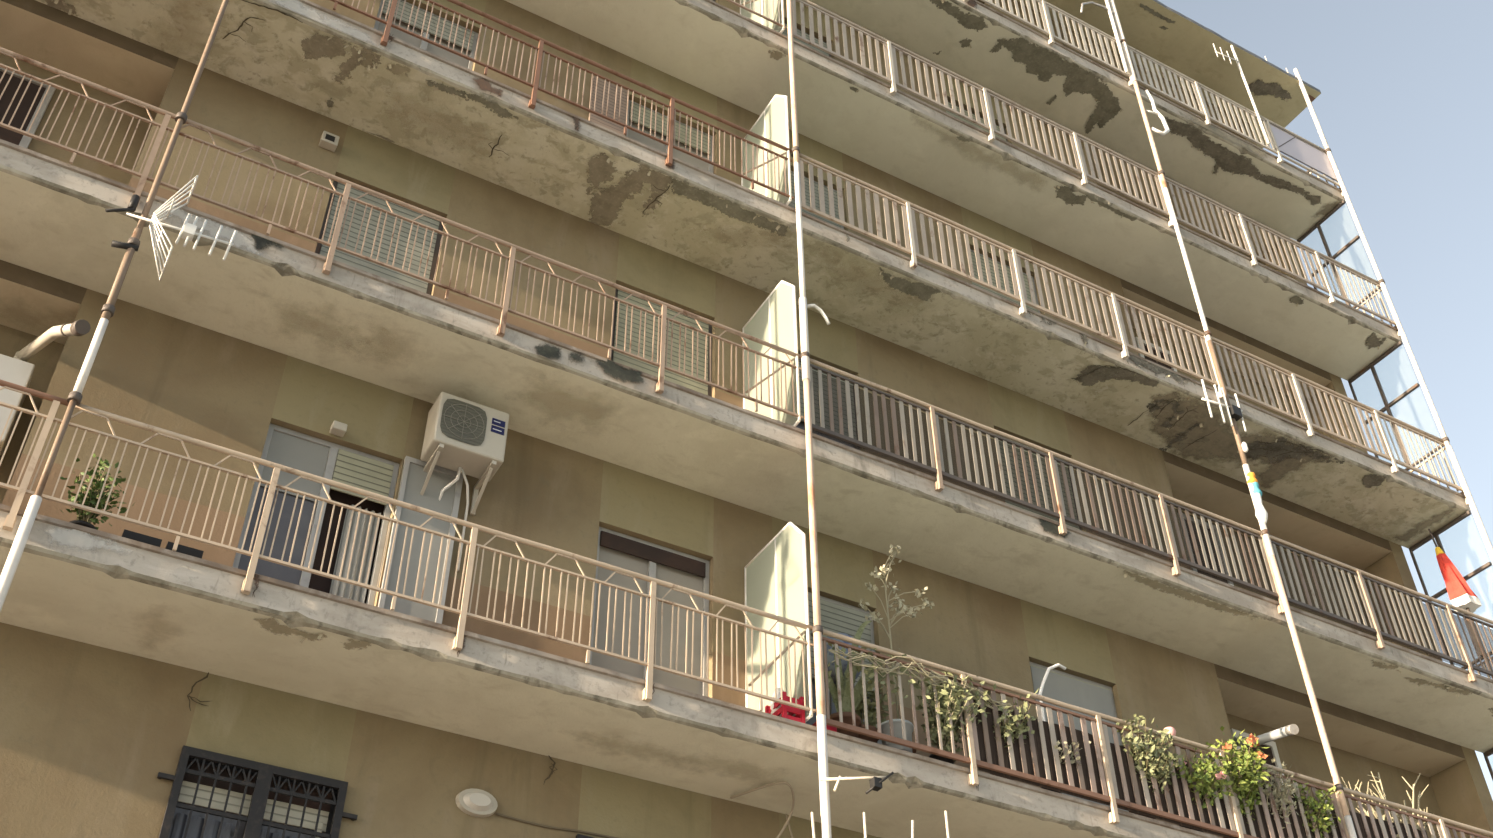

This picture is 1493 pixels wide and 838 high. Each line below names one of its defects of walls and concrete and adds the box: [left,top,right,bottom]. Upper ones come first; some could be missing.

crack [223,0,303,42]
peeling [301,31,410,107]
peeling [930,0,1122,134]
peeling [425,80,519,120]
spalling [1248,79,1316,102]
spalling [1165,117,1321,206]
peeling [586,153,788,236]
spalling [1072,355,1204,451]
spalling [1231,437,1345,464]
spalling [1362,474,1385,488]
crack [187,672,210,711]